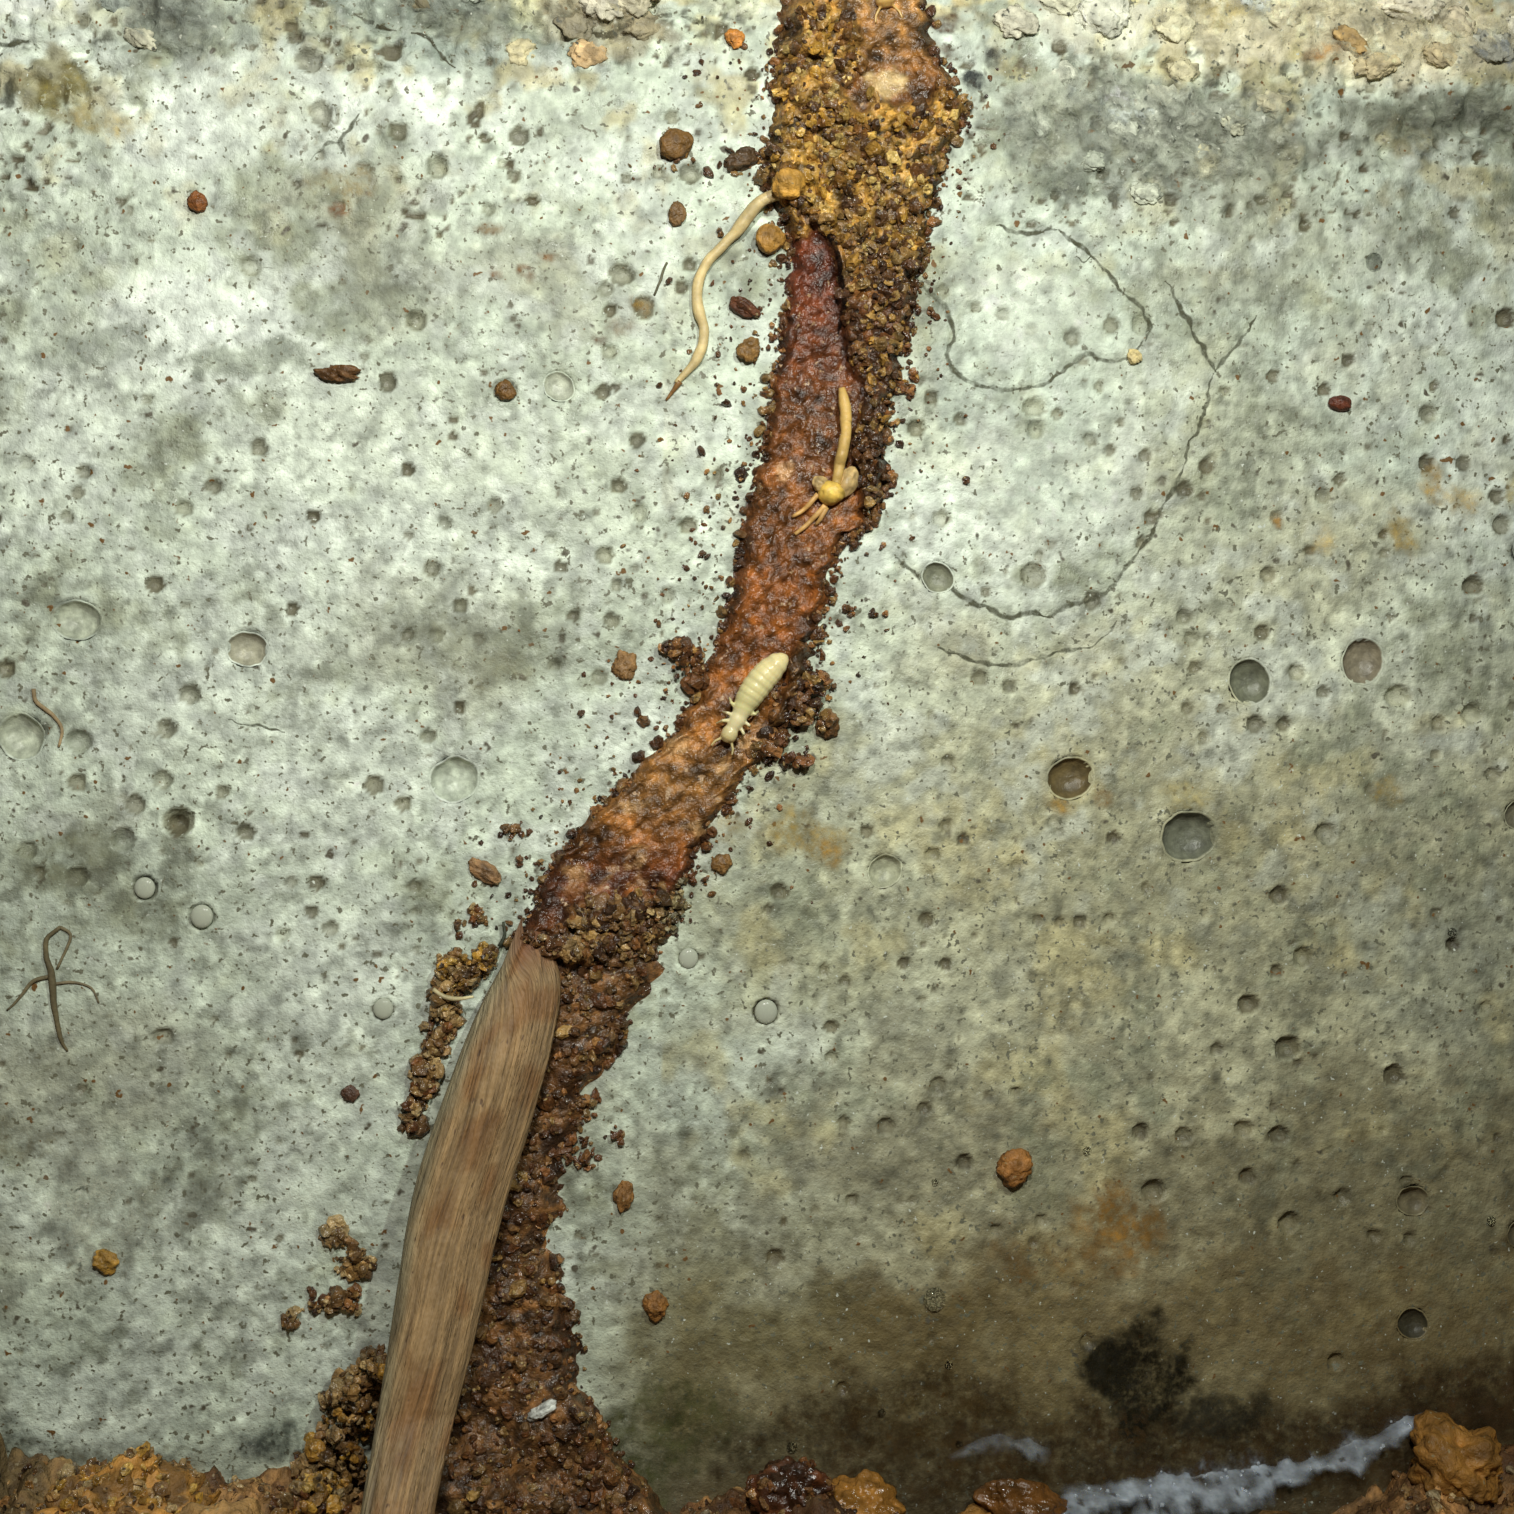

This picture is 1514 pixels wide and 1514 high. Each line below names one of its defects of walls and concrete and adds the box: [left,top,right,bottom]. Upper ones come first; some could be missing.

crack [903,224,1257,667]
leakage [608,1384,766,1483]
leakage [779,1307,1514,1514]